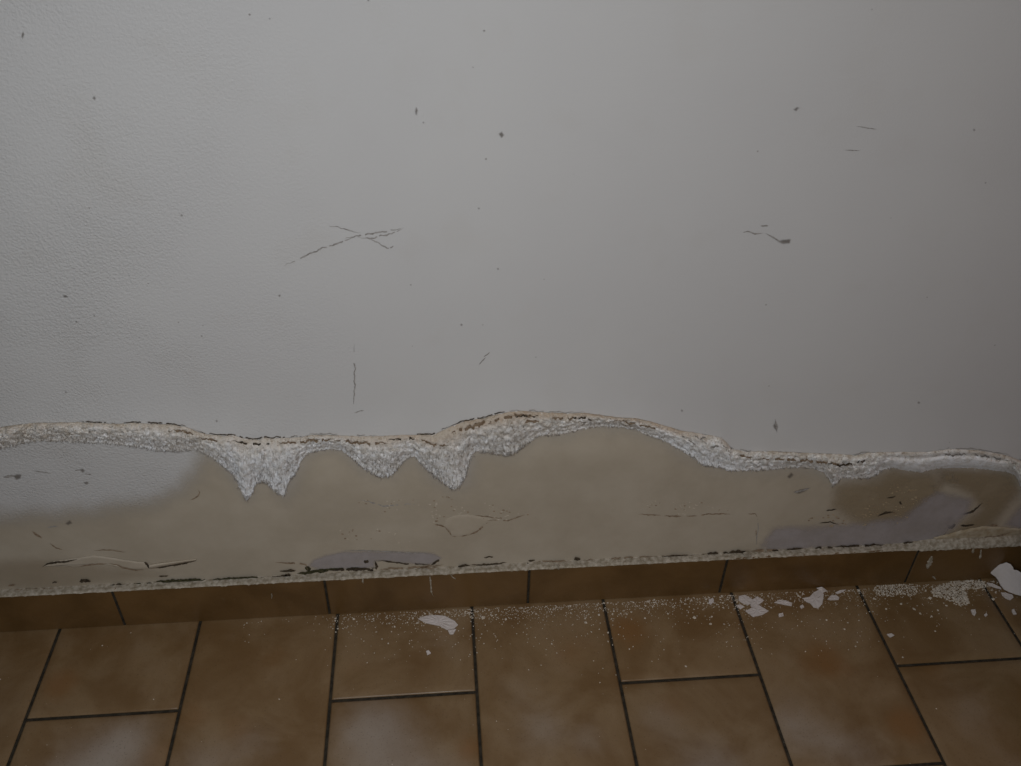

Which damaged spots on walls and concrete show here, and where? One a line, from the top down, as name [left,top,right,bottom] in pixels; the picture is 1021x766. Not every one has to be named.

crack [287,226,401,264]
peeling [0,410,1021,527]
leakage [0,425,1021,590]
peeling [43,549,196,571]
peeling [275,550,440,572]
peeling [418,615,458,635]
peeling [736,595,784,617]
peeling [987,562,1021,615]